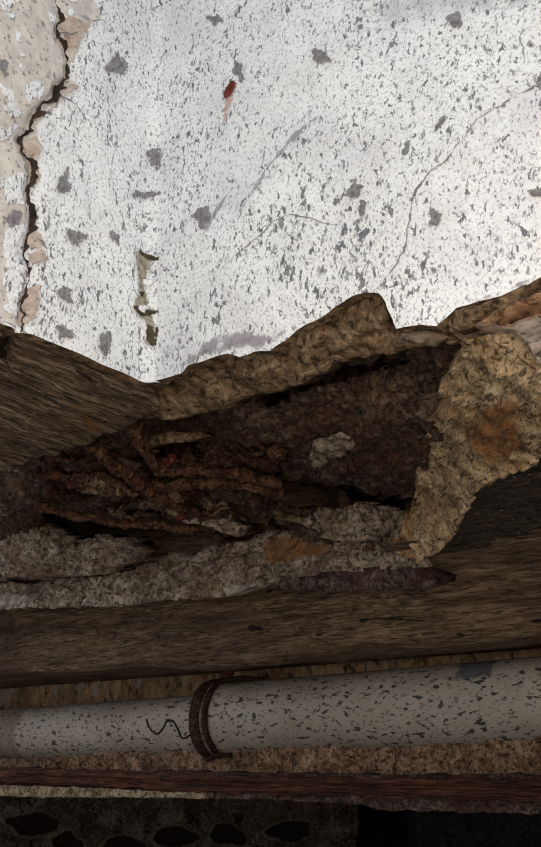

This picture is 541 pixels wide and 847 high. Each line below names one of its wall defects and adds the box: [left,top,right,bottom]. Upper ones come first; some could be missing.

peeling [0,0,101,326]
crack [0,0,111,358]
spalling [134,250,160,346]
corrosion [223,80,236,121]
spalling [0,277,541,612]